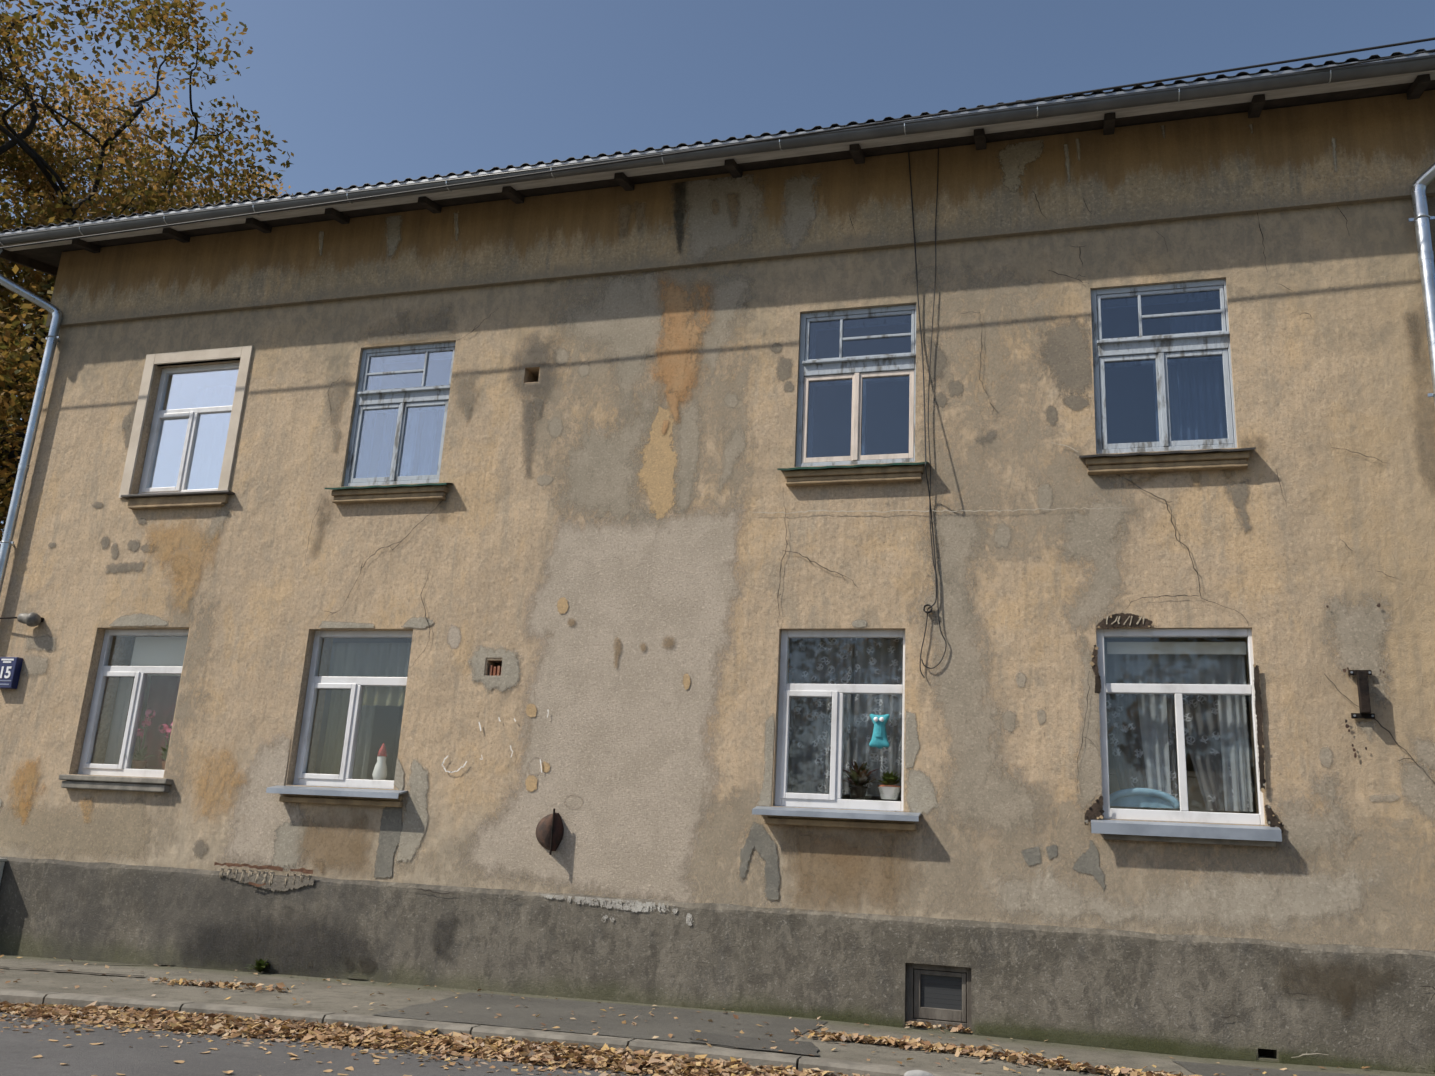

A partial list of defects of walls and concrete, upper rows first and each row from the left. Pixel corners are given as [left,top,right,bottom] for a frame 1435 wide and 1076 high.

water stain [673,182,686,250]
peeling [671,174,763,263]
peeling [783,175,819,249]
water stain [514,341,553,475]
peeling [771,343,794,392]
peeling [100,518,158,574]
crack [326,499,444,619]
peeling [401,271,751,926]
crack [749,474,1249,625]
crack [1324,673,1435,783]
peeling [374,757,429,878]
peeling [739,713,780,900]